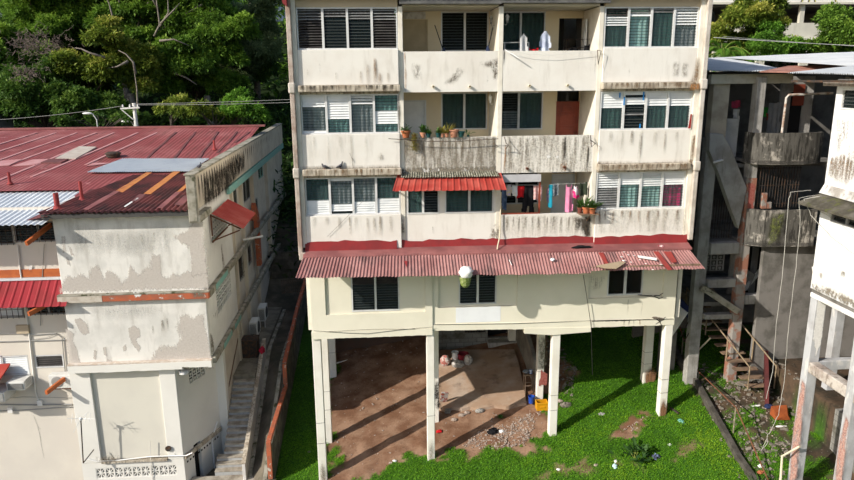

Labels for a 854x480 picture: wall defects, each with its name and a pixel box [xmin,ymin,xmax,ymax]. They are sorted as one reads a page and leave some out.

leakage [198,146,254,205]
leakage [304,136,695,174]
leakage [831,149,853,178]
leakage [568,212,600,237]
peeling [60,222,208,299]
peeling [66,318,89,363]
peeling [123,326,140,351]
peeling [152,315,212,368]